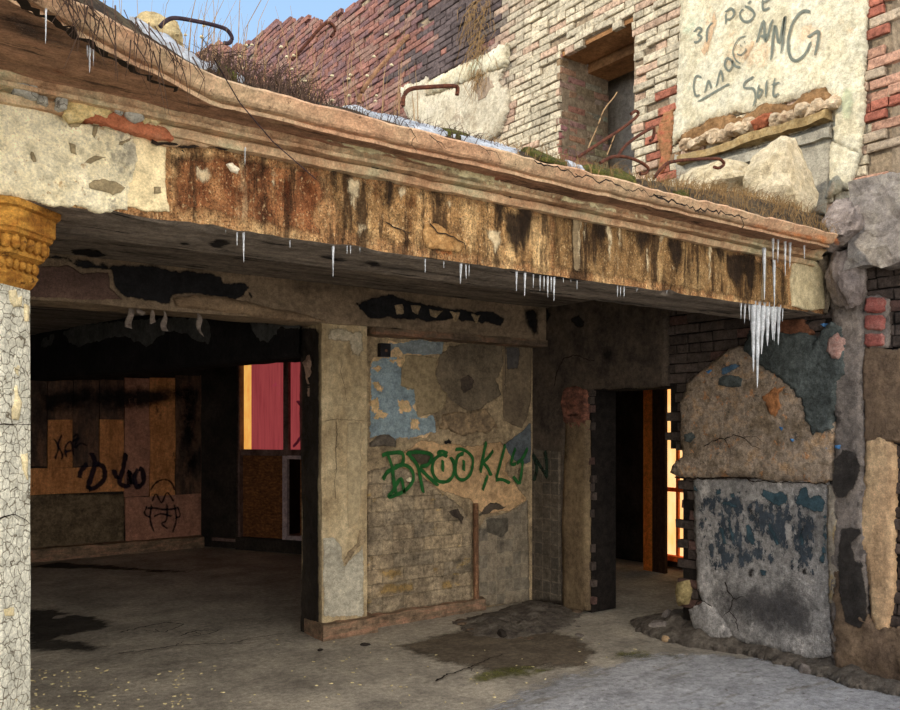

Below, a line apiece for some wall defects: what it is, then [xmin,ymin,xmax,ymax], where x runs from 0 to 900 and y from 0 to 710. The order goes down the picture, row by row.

spalling [11,83,174,145]
spalling [89,179,125,195]
leakage [408,158,510,188]
corrosion [171,157,788,305]
leakage [553,195,616,212]
crack [534,160,747,228]
peeling [9,255,363,356]
peeling [369,339,531,538]
peeling [694,486,827,576]
leakage [30,609,108,651]
leakage [398,631,596,671]
leakage [721,582,817,633]